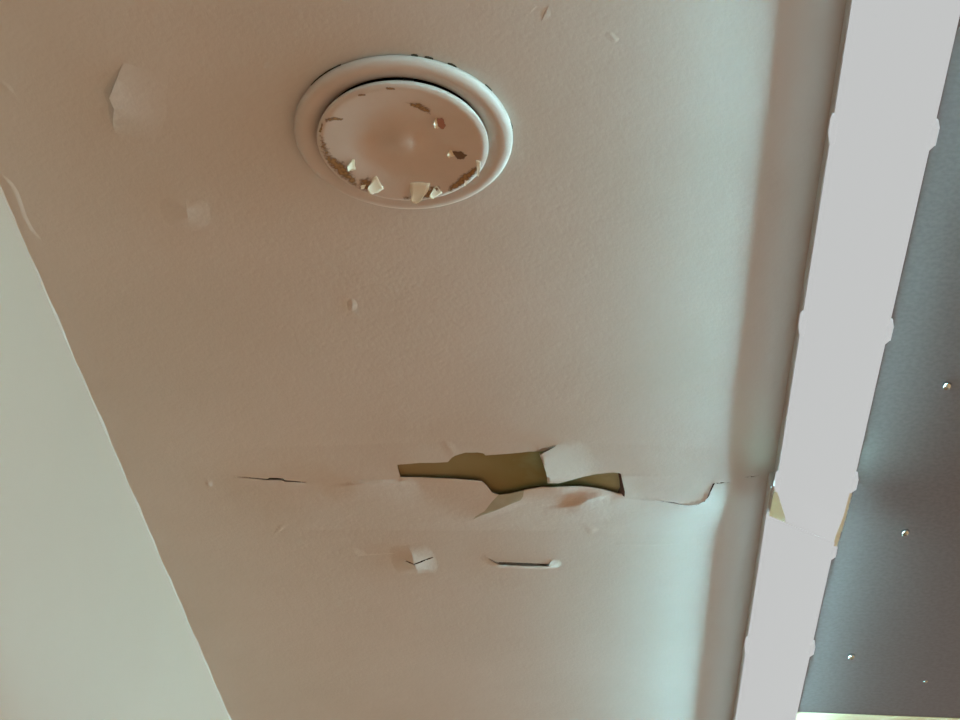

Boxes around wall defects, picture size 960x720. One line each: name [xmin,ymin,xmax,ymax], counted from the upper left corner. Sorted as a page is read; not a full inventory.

peeling [433,118,446,129]
rust [319,117,371,189]
peeling [359,176,384,195]
peeling [409,182,442,203]
peeling [447,150,480,186]
rust [450,167,477,191]
peeling [397,444,625,519]